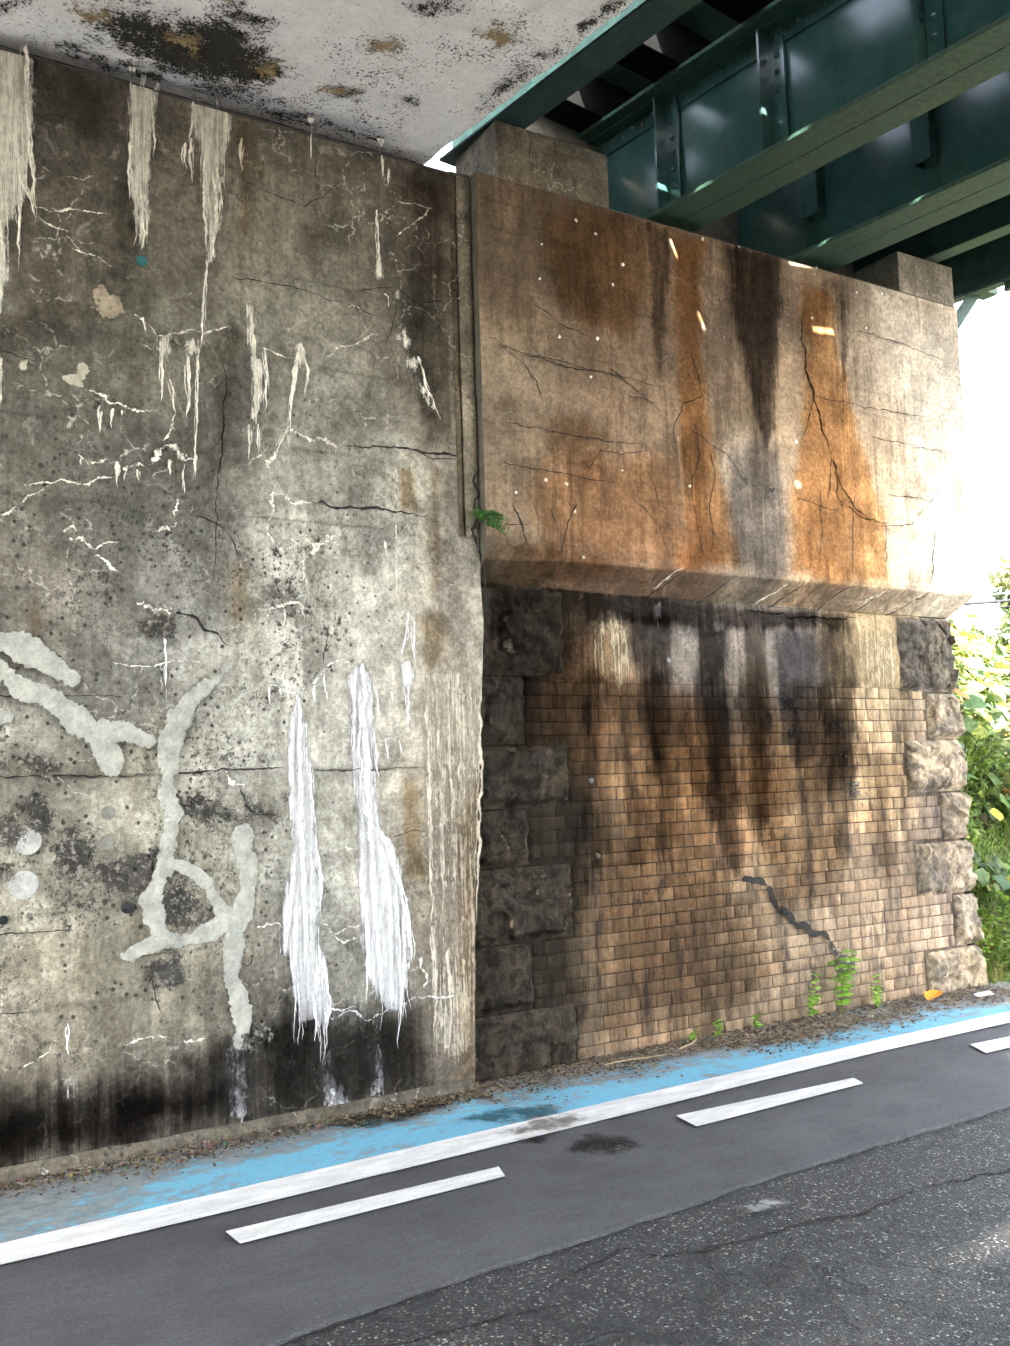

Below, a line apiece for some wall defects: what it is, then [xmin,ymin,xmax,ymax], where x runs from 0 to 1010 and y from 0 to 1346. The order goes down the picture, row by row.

efflorescence [0,33,37,313]
efflorescence [127,66,159,248]
efflorescence [157,92,245,476]
crack [235,278,443,359]
crack [1,301,749,704]
damp [726,244,783,446]
crack [756,306,948,619]
damp [0,584,896,1168]
crack [742,875,838,957]